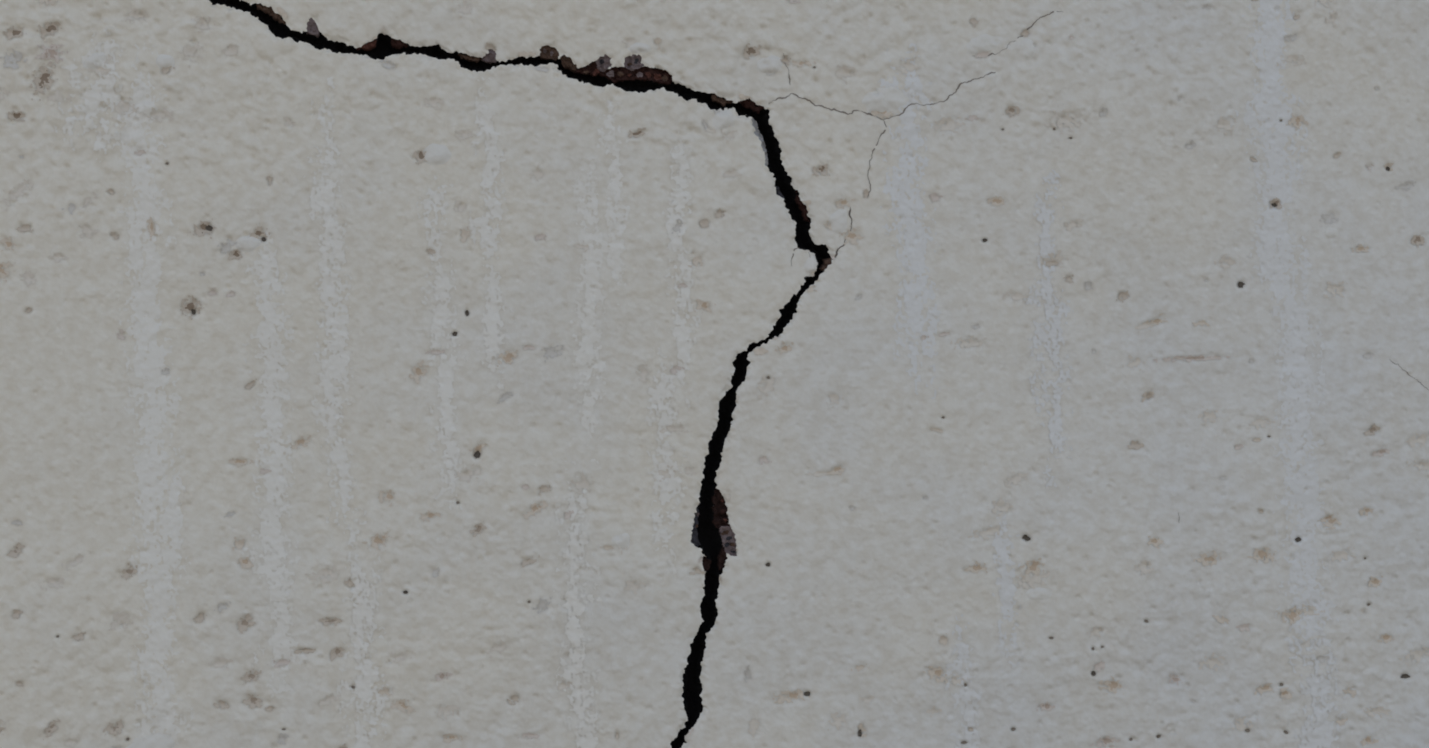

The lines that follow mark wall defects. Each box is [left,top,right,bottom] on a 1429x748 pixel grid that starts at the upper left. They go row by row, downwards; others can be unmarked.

crack [209,0,1062,748]